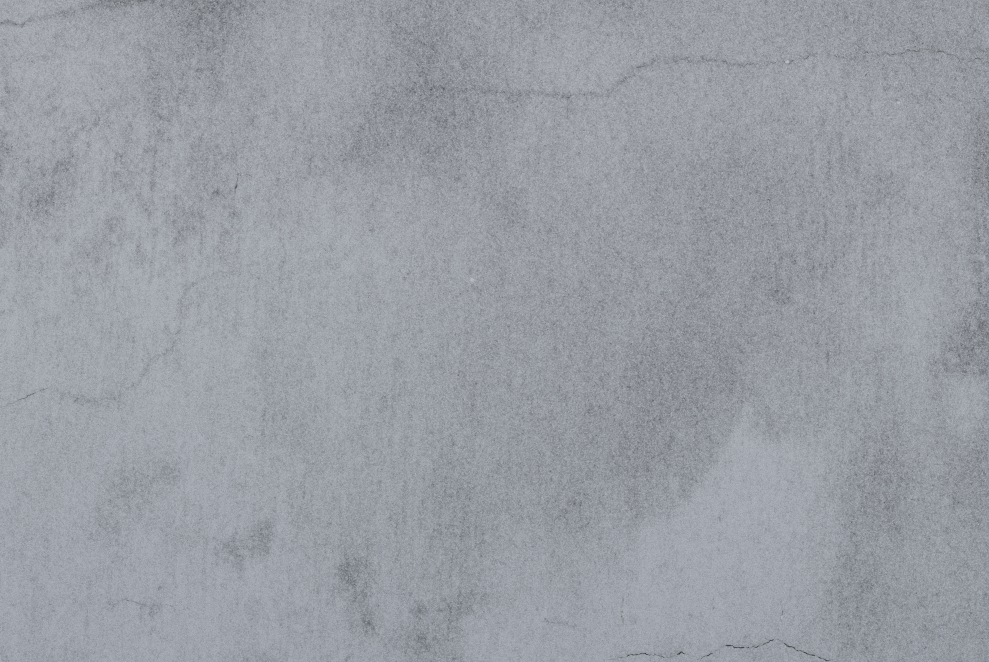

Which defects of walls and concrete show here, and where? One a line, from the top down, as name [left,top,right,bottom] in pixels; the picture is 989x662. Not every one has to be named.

crack [393,46,989,119]
crack [6,269,230,409]
crack [607,597,829,662]